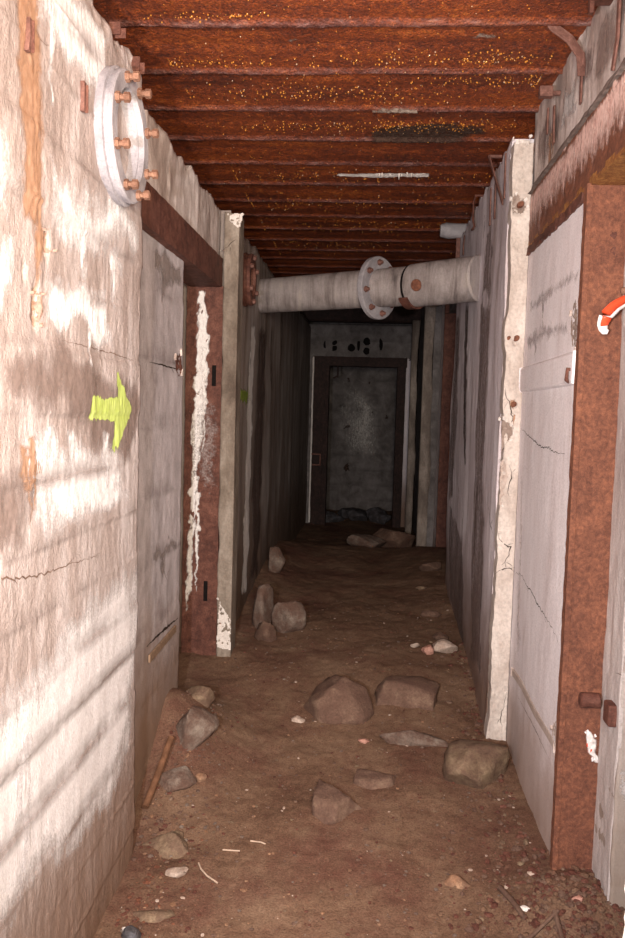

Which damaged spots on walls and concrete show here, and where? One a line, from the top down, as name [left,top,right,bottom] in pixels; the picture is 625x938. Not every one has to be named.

rust [18,0,44,290]
crack [1,553,100,583]
damp [185,291,214,601]
crack [505,390,564,454]